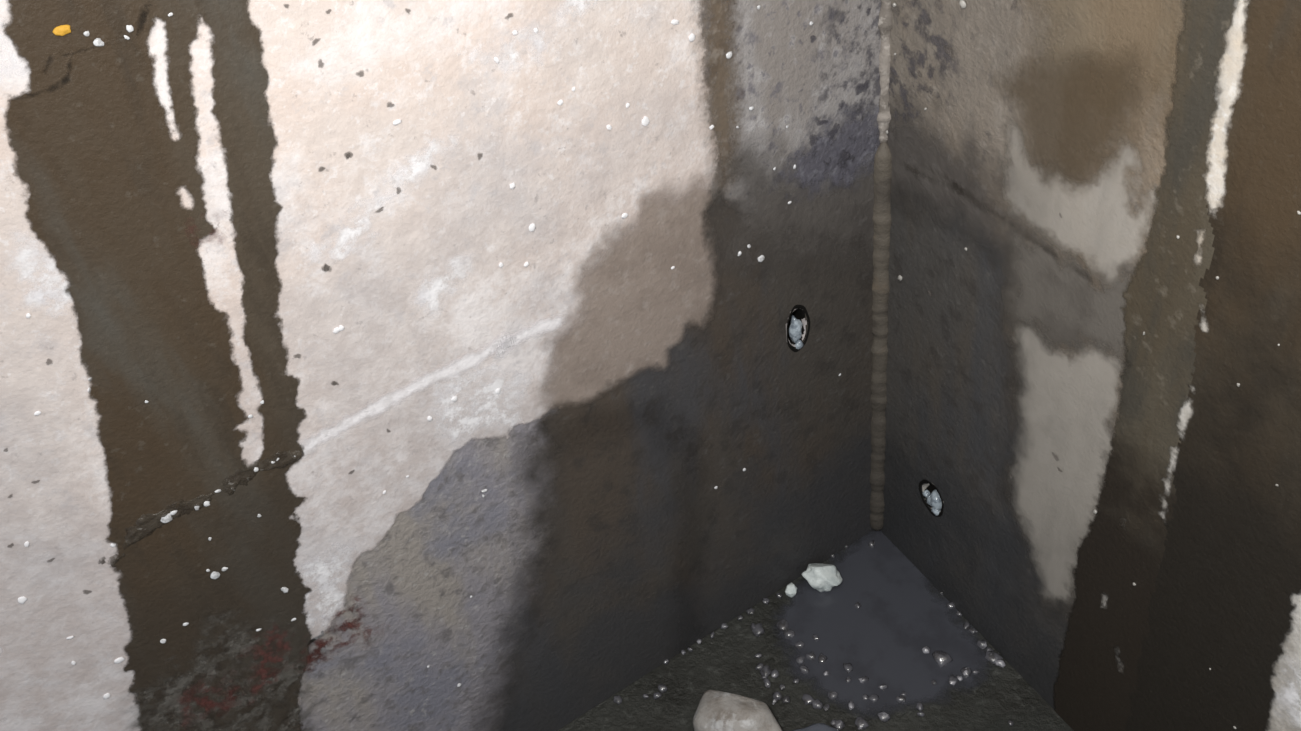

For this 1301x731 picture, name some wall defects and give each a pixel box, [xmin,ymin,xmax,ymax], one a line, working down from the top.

water stain [4,0,881,731]
water stain [876,0,1301,731]